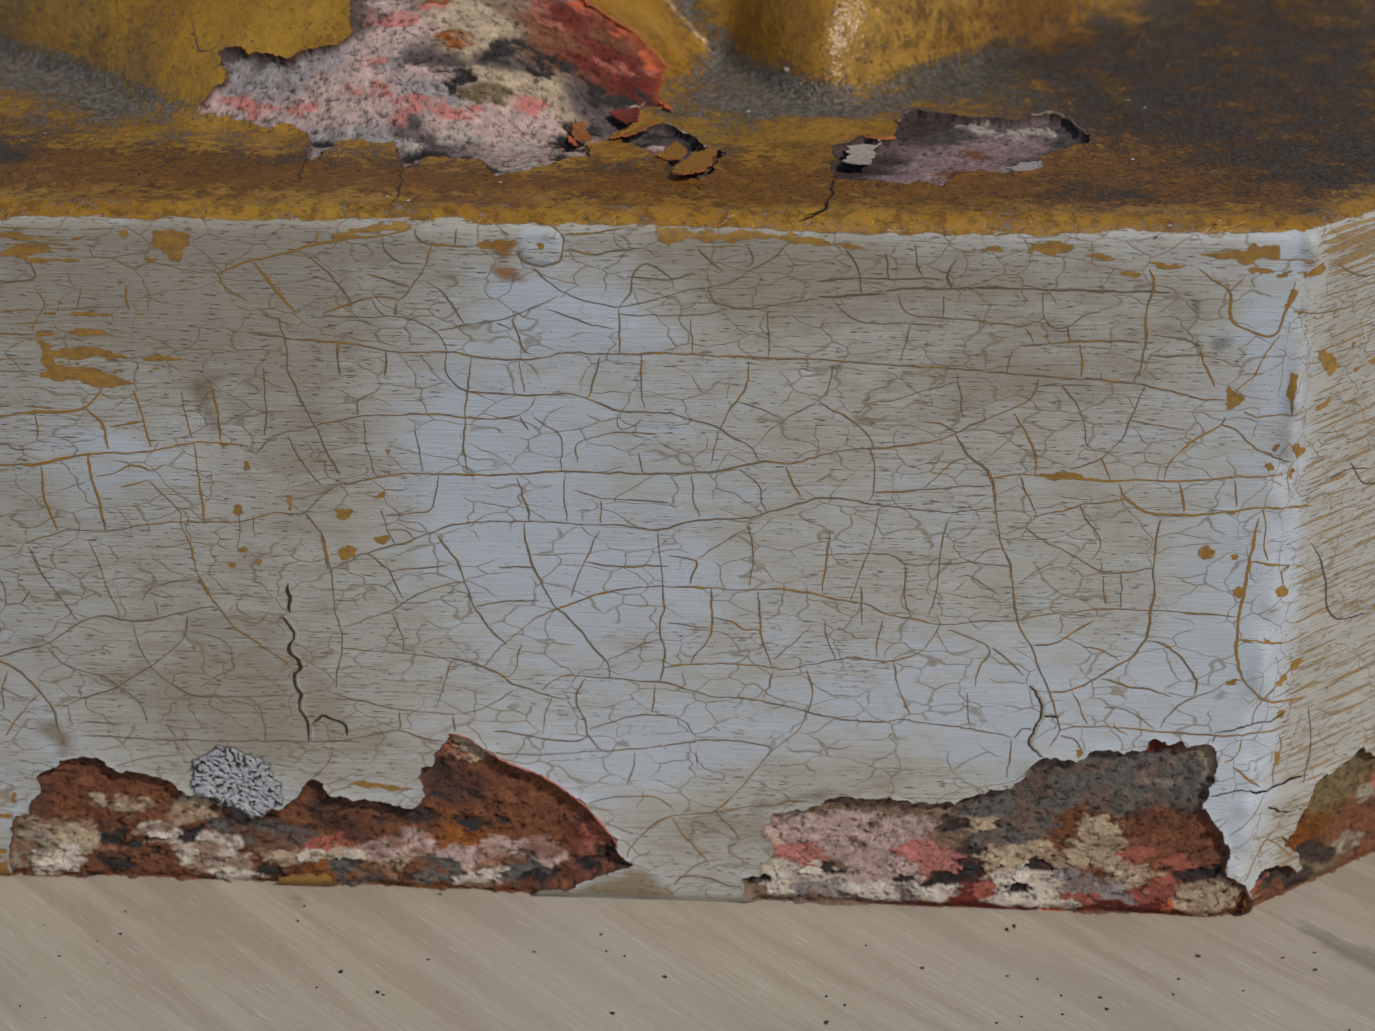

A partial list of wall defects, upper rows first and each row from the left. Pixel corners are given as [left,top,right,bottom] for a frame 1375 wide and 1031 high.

crack [191,16,224,52]
peeling [197,0,726,183]
peeling [829,109,1090,186]
crack [0,162,1375,887]
peeling [8,733,633,895]
peeling [742,739,1375,917]